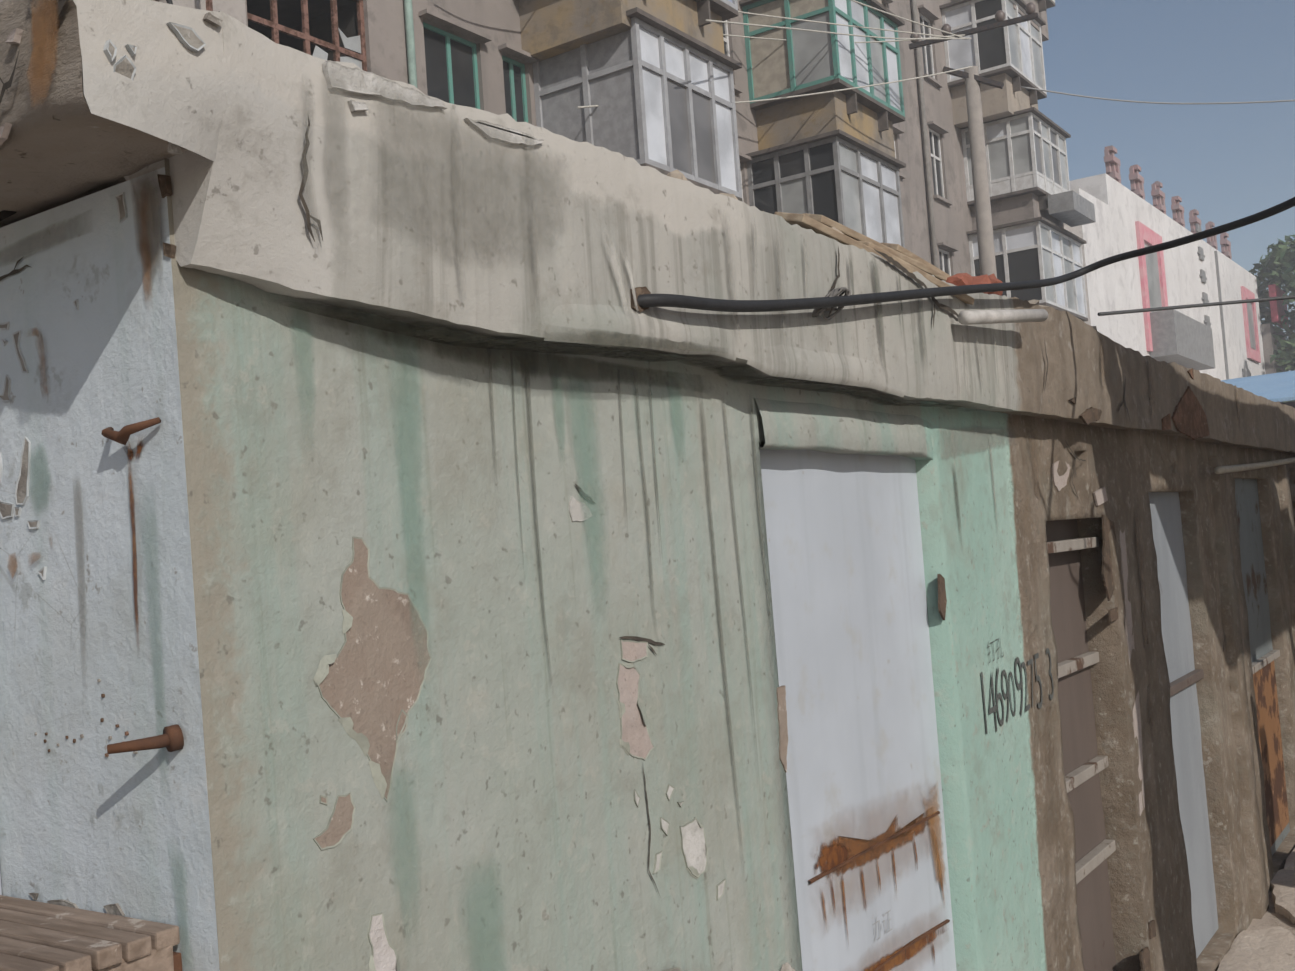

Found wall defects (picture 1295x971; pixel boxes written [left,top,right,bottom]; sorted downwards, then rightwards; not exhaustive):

crack [0,49,24,104]
rust [27,0,56,99]
crack [299,112,323,242]
crack [0,257,32,281]
water stain [305,310,958,660]
water stain [704,436,734,764]
peeling [314,536,432,802]
peeling [616,640,655,760]
peeling [313,792,356,850]
rust [816,793,945,934]
peeling [367,912,400,971]
rust [865,929,936,971]